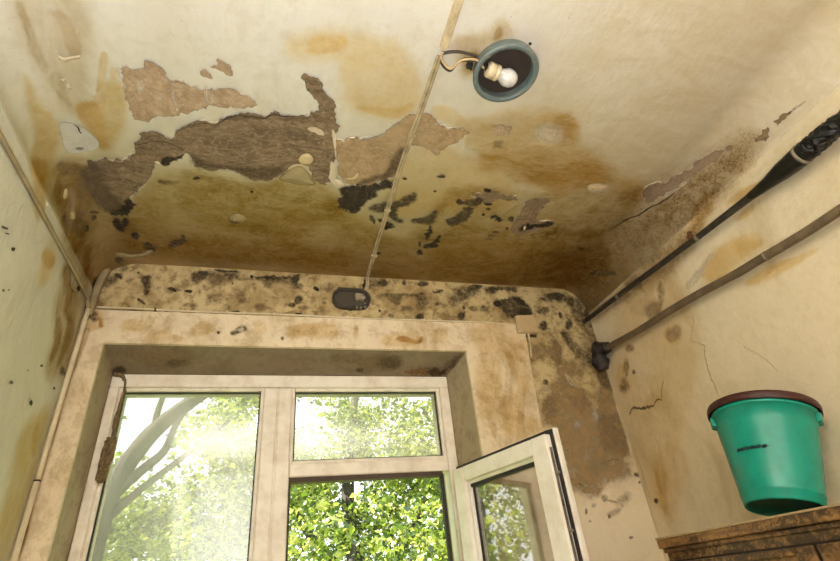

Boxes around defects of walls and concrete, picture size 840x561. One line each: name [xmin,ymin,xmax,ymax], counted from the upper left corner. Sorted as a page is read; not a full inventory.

spalling [60,58,471,213]
peeling [755,108,795,142]
mould [103,198,155,287]
mould [333,178,441,255]
mould [446,189,518,240]
peeling [511,198,554,236]
mould [137,271,151,305]
mould [168,269,307,314]
mould [362,279,443,319]
leakage [451,285,597,367]
crack [690,319,719,396]
crack [630,384,663,414]